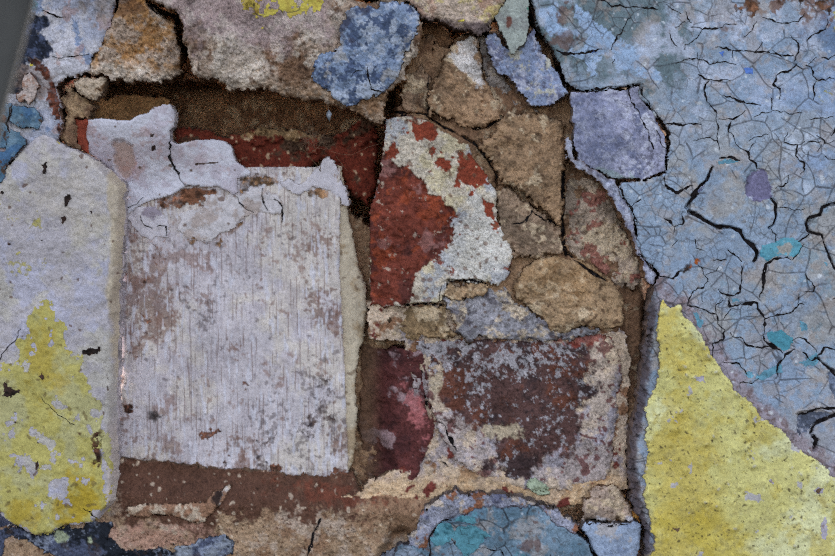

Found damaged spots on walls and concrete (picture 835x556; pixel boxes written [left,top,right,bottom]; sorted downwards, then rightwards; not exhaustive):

peeling [0,103,43,183]
peeling [129,187,283,241]
crack [513,172,607,281]
crack [529,0,835,384]
spalling [357,344,435,485]
crack [798,407,835,449]
crack [307,518,322,556]
crack [428,519,458,556]
crack [581,519,627,556]